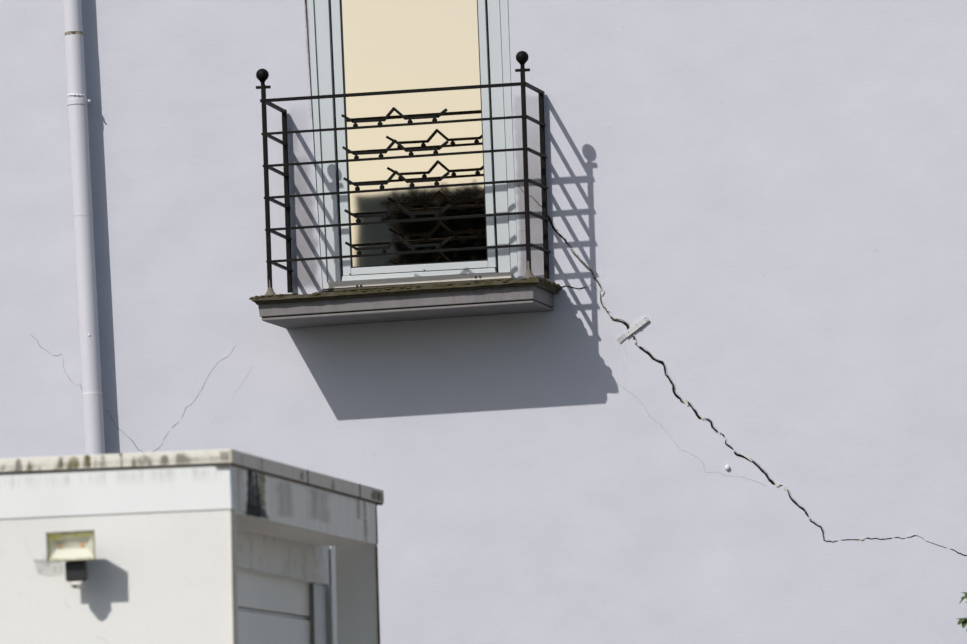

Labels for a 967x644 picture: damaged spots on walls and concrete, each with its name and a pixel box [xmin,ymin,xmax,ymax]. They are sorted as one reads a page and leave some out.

damp [247,470,268,519]
crack [518,184,967,556]